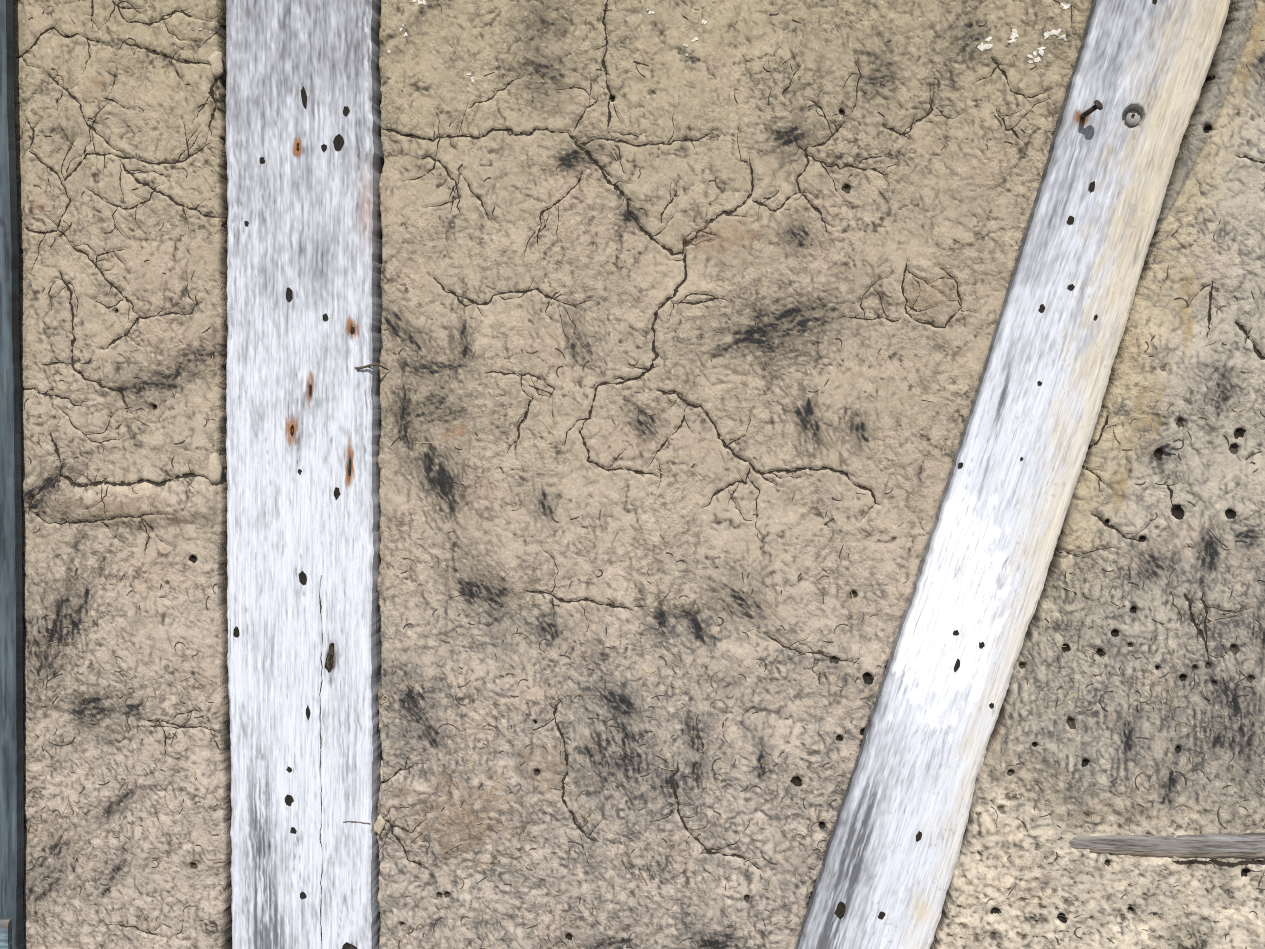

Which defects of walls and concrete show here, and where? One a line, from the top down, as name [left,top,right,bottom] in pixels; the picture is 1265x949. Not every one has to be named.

crack [978,56,1053,139]
crack [16,0,228,555]
crack [382,0,973,536]
corrosion [347,319,358,337]
crack [1180,281,1265,360]
corrosion [286,419,297,443]
corrosion [345,446,353,485]
crack [527,551,650,636]
crack [767,635,862,680]
crack [535,701,607,866]
crack [656,763,761,870]